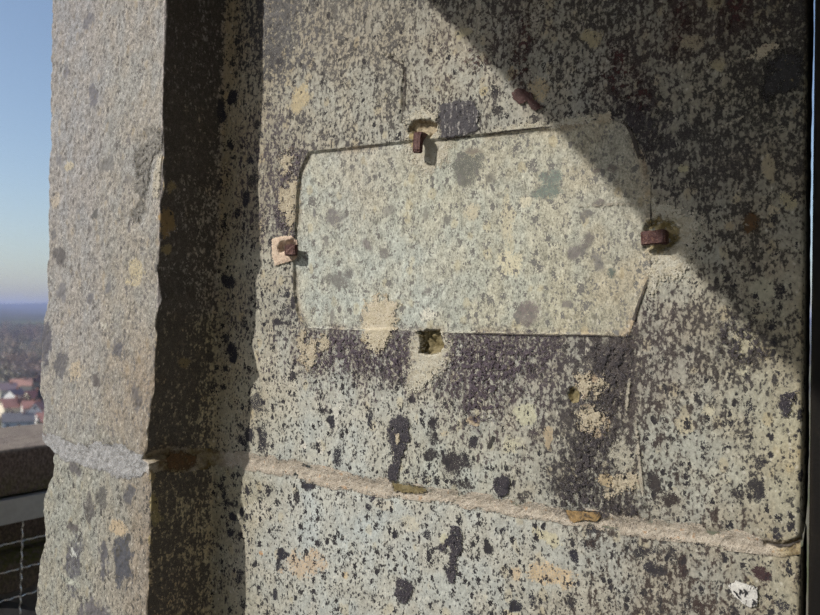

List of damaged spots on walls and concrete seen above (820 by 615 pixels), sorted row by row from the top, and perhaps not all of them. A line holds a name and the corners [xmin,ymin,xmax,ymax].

corrosion [646,216,680,253]
damp [291,325,416,387]
spalling [357,292,403,356]
spalling [403,327,454,393]
damp [440,323,558,433]
peeling [728,581,758,607]